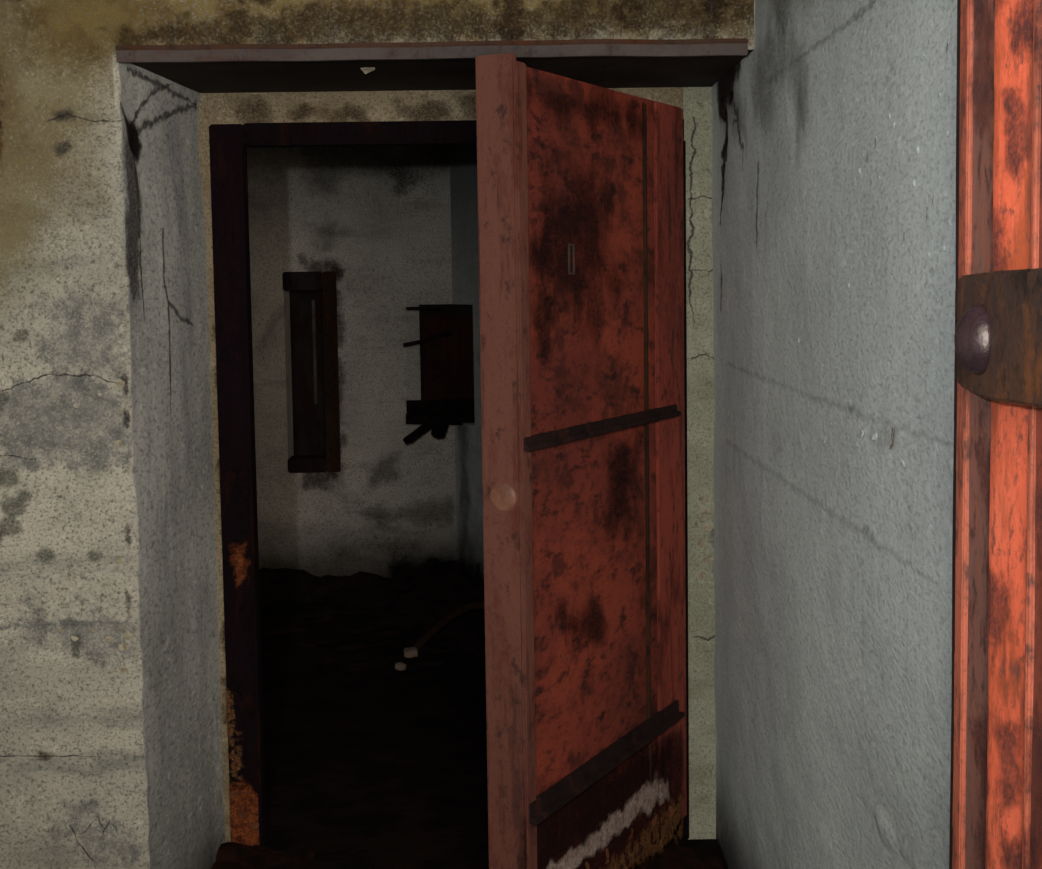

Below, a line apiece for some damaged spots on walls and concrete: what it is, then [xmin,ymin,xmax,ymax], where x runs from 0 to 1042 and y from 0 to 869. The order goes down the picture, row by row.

damp [0,0,754,284]
crack [687,81,759,328]
damp [0,470,30,540]
corrosion [229,543,250,585]
corrosion [223,679,260,846]